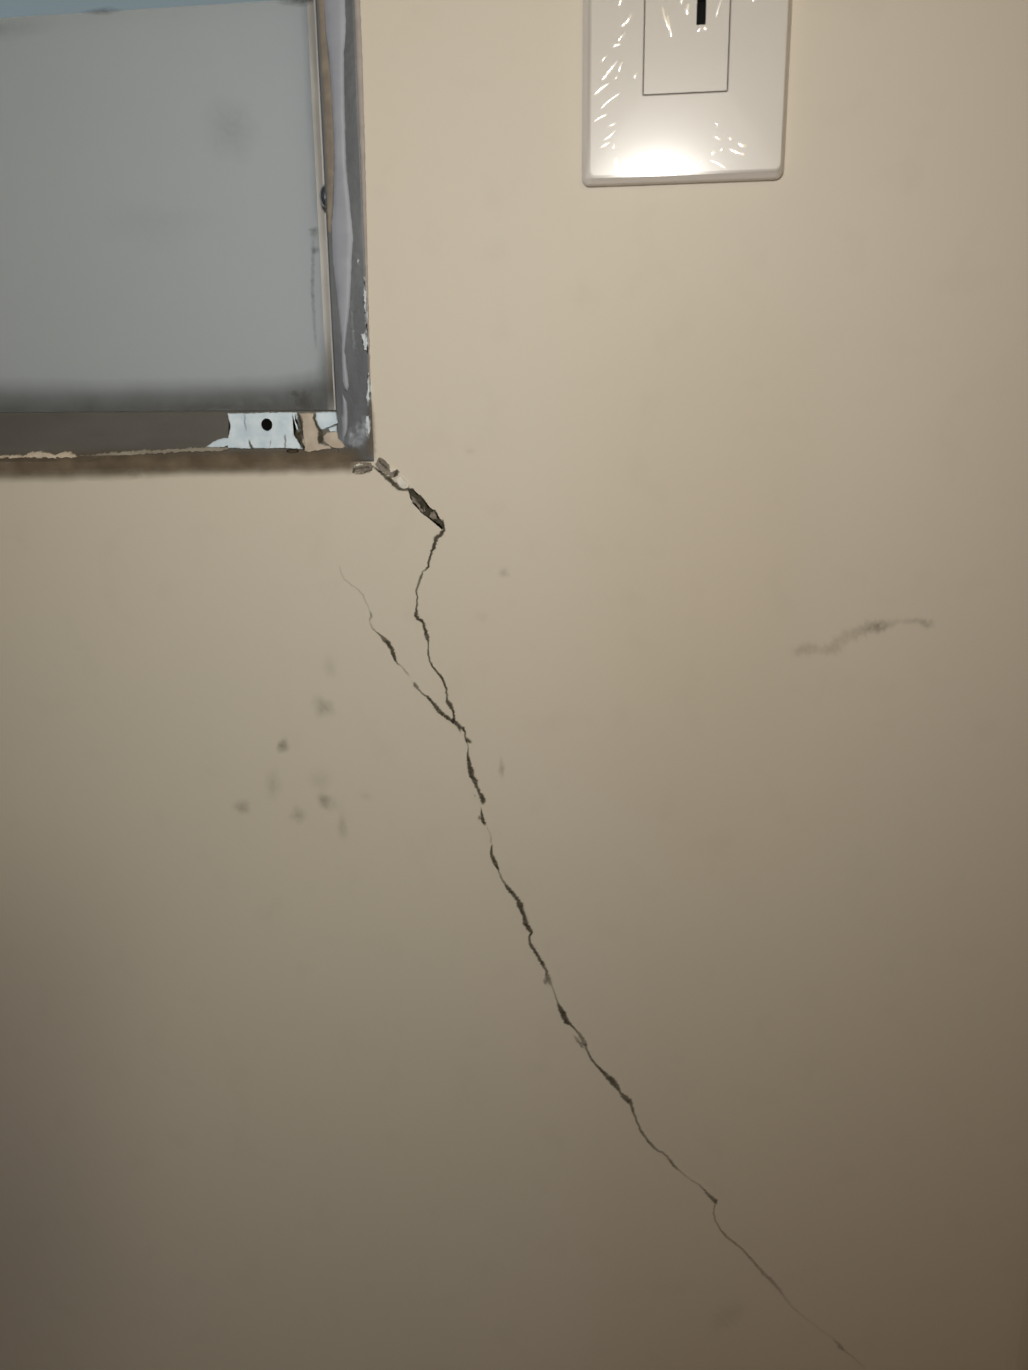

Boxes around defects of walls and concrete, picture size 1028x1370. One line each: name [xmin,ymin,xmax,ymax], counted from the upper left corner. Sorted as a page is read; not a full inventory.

crack [352,457,574,1028]
crack [590,1056,650,1143]